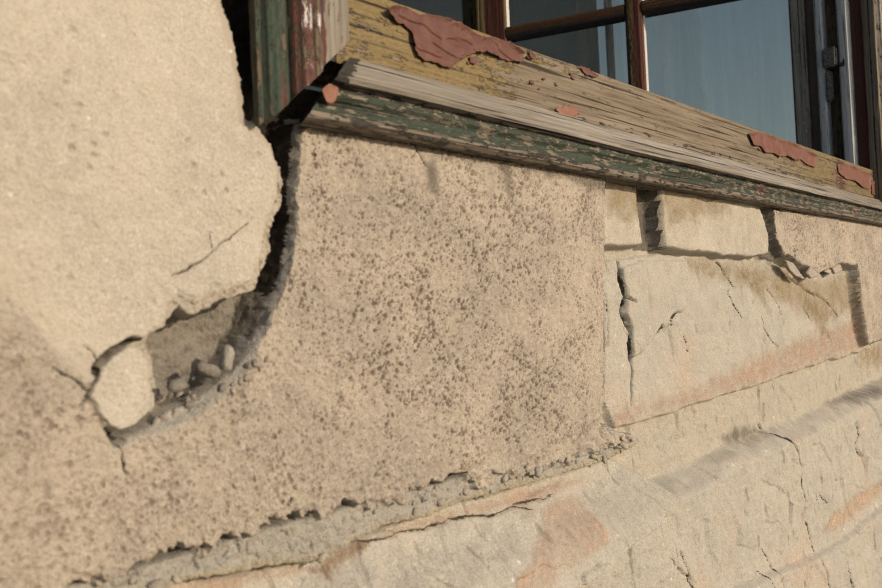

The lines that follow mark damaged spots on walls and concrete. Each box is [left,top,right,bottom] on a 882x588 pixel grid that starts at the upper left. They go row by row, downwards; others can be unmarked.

peeling [387,4,536,68]
peeling [322,84,339,103]
peeling [749,132,818,167]
peeling [832,164,875,195]
crack [171,224,247,276]
crack [121,336,143,344]
flaking render [89,123,305,449]
crack [606,274,632,355]
crack [715,262,781,343]
crack [53,345,99,406]
flaking render [65,427,639,588]
crack [357,494,551,543]